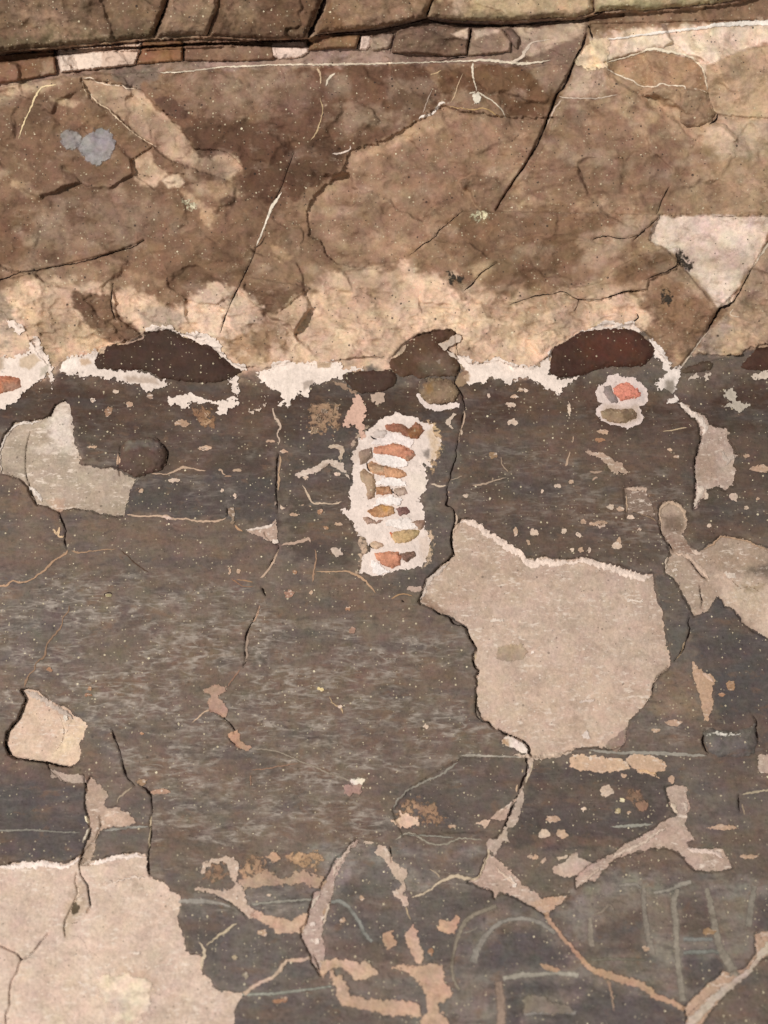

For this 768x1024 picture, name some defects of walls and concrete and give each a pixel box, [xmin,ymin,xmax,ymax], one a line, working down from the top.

crack [0,0,168,71]
crack [255,0,603,208]
crack [0,242,141,280]
crack [220,153,294,333]
crack [510,253,678,322]
crack [593,187,669,240]
crack [682,243,768,366]
peeling [437,334,462,364]
spalling [506,388,528,426]
spalling [0,401,768,1024]
crack [2,725,153,1024]
crack [199,923,237,970]